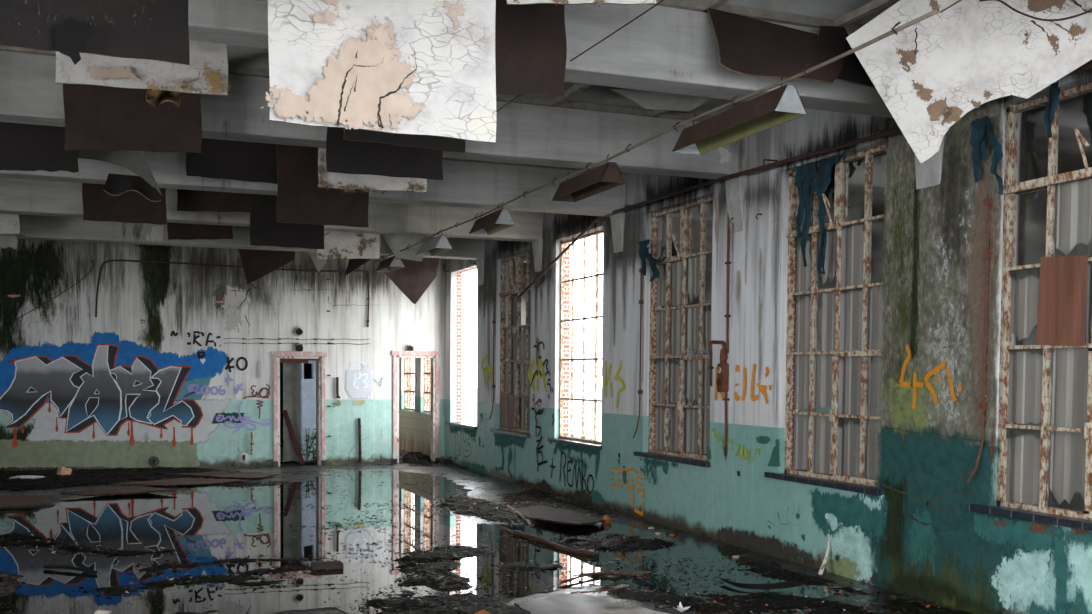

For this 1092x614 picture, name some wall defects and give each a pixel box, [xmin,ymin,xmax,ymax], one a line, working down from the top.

peeling [261,0,426,132]
crack [336,47,417,129]
peeling [1024,0,1072,14]
crack [1030,0,1092,53]
peeling [1047,22,1086,56]
damp [122,225,164,242]
damp [0,239,124,355]
damp [177,248,270,331]
damp [812,99,1092,614]
peeling [859,493,884,510]
peeling [821,513,877,584]
peeling [989,521,1092,614]